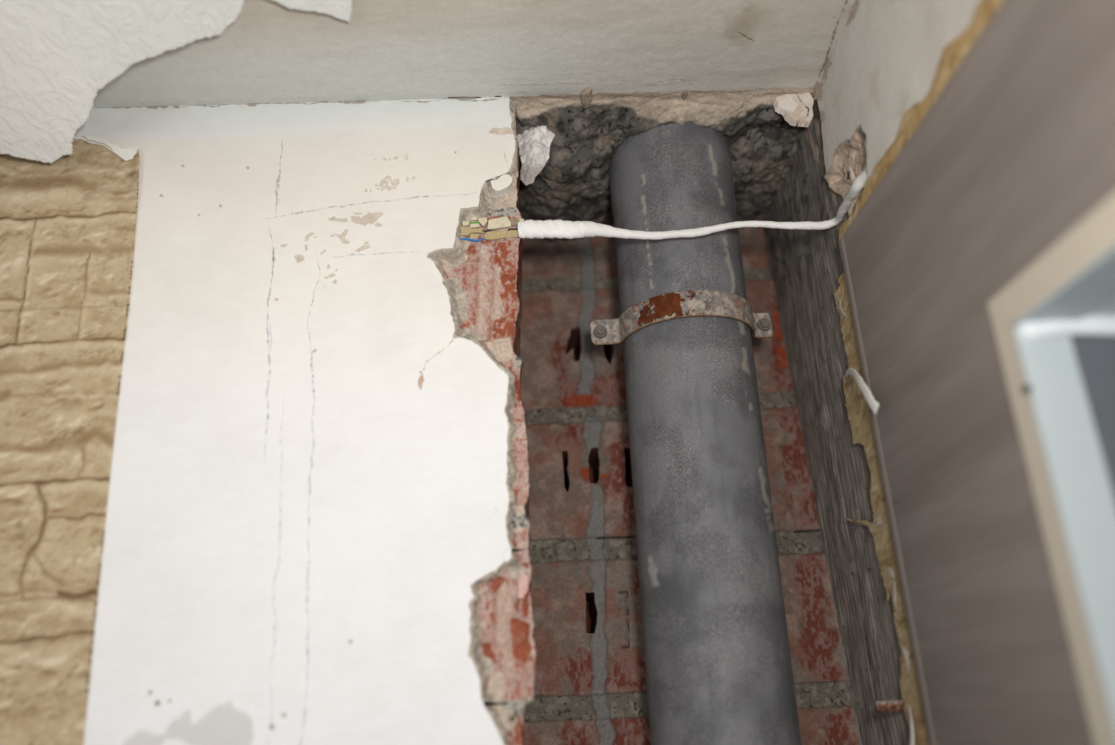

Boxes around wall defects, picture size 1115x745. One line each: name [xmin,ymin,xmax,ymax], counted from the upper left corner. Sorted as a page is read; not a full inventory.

peeling [813,57,832,122]
flaking render [824,126,866,216]
rust [638,290,704,327]
spalling [565,326,581,361]
spalling [603,345,613,364]
flaking render [427,97,536,745]
spalling [562,451,570,492]
spalling [588,448,600,484]
spalling [624,447,633,487]
spalling [585,592,597,634]